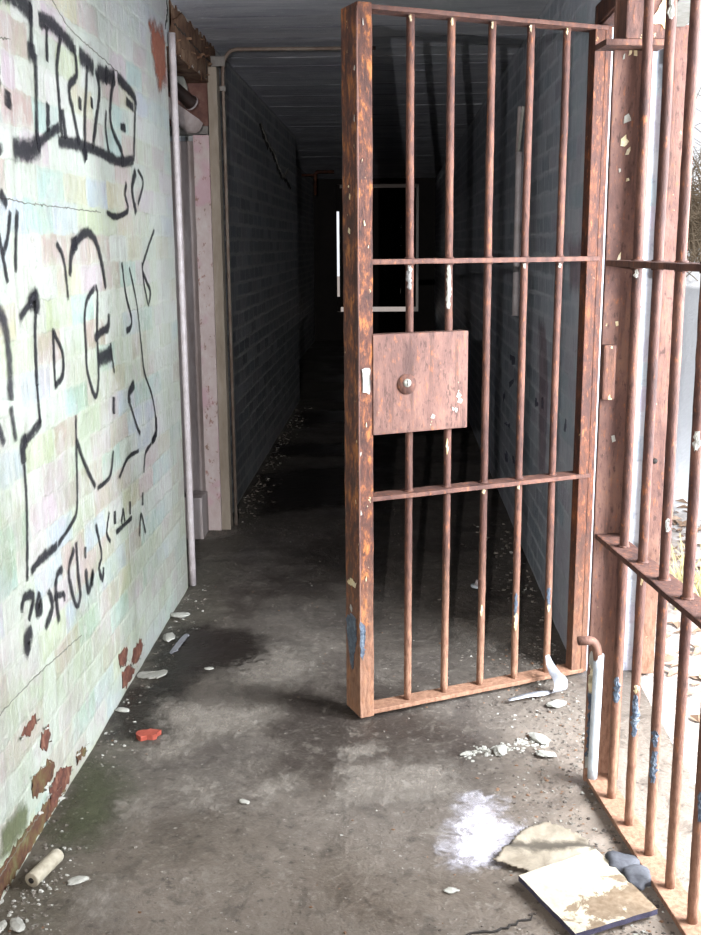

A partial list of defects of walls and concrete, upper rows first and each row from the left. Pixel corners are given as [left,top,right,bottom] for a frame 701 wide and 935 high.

peeling [654,0,675,29]
peeling [118,638,144,689]
leakage [105,625,267,740]
peeling [0,713,90,904]
spalling [0,917,25,933]
crack [466,915,533,935]